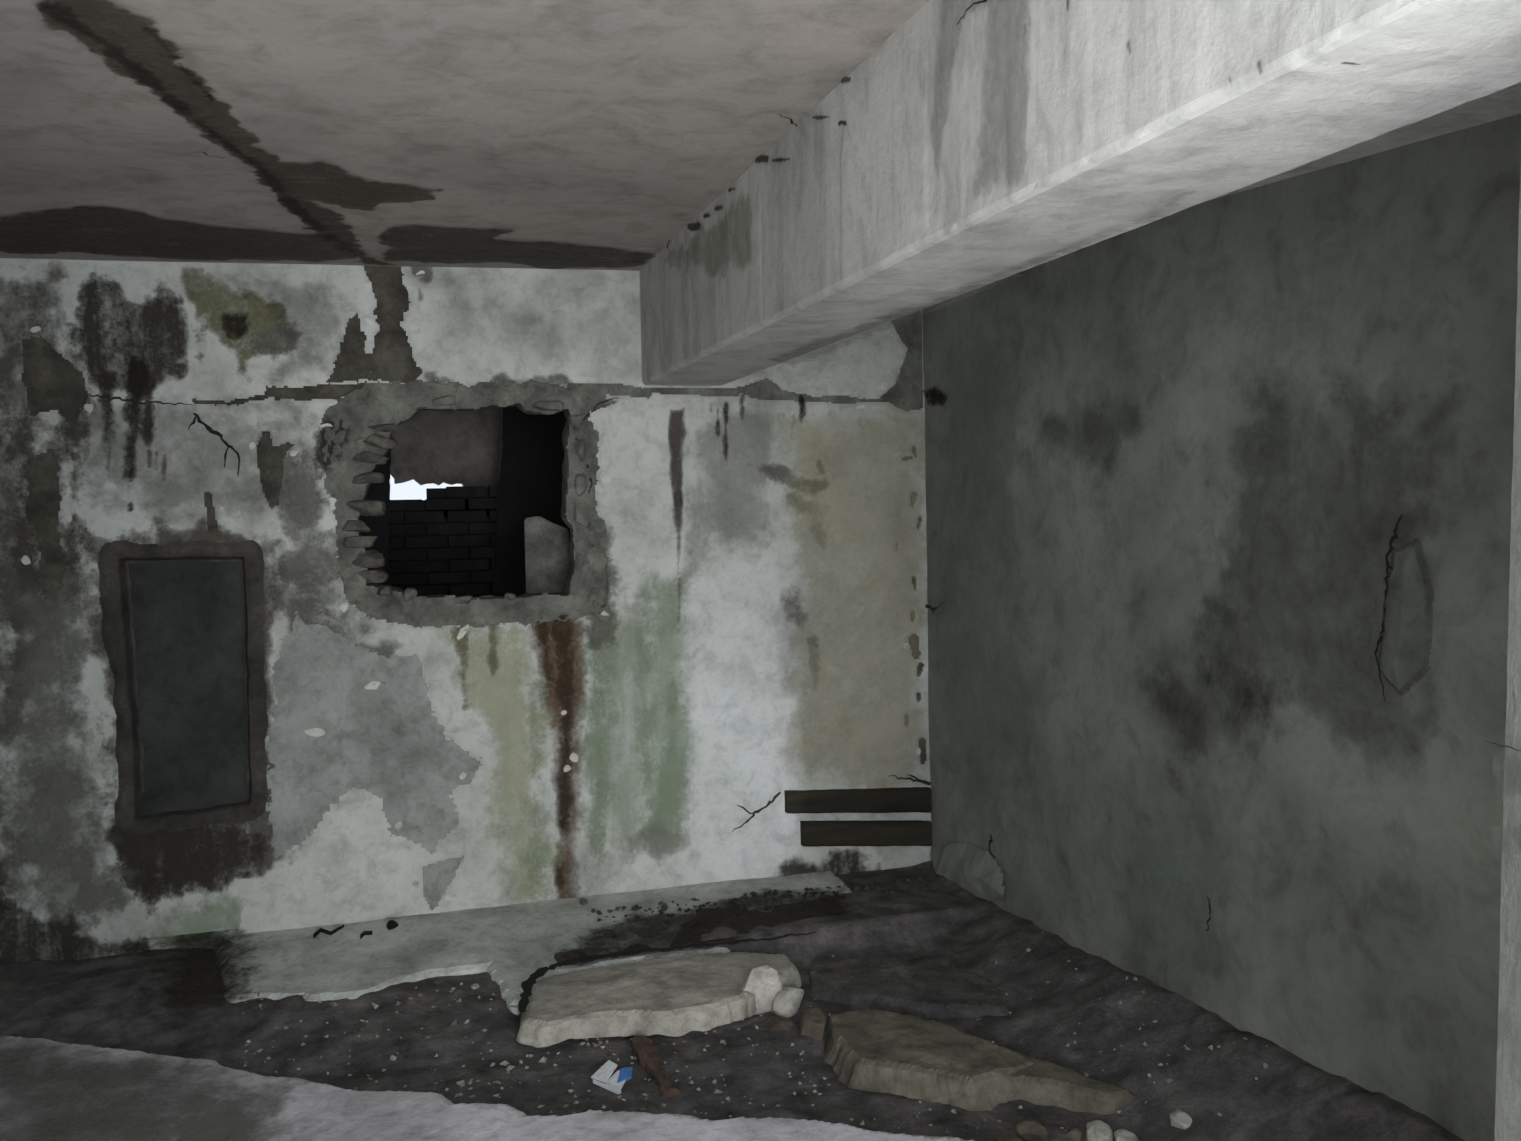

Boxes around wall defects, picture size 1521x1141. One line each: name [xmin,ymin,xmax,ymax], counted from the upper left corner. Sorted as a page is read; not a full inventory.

crack [957,0,988,25]
crack [88,394,240,476]
water stain [0,0,655,1017]
spalling [192,266,923,640]
corrosion [668,410,686,547]
peeling [265,611,482,911]
corrosion [532,616,598,899]
crack [732,792,781,832]
spalling [903,610,926,764]
crack [1374,514,1403,701]